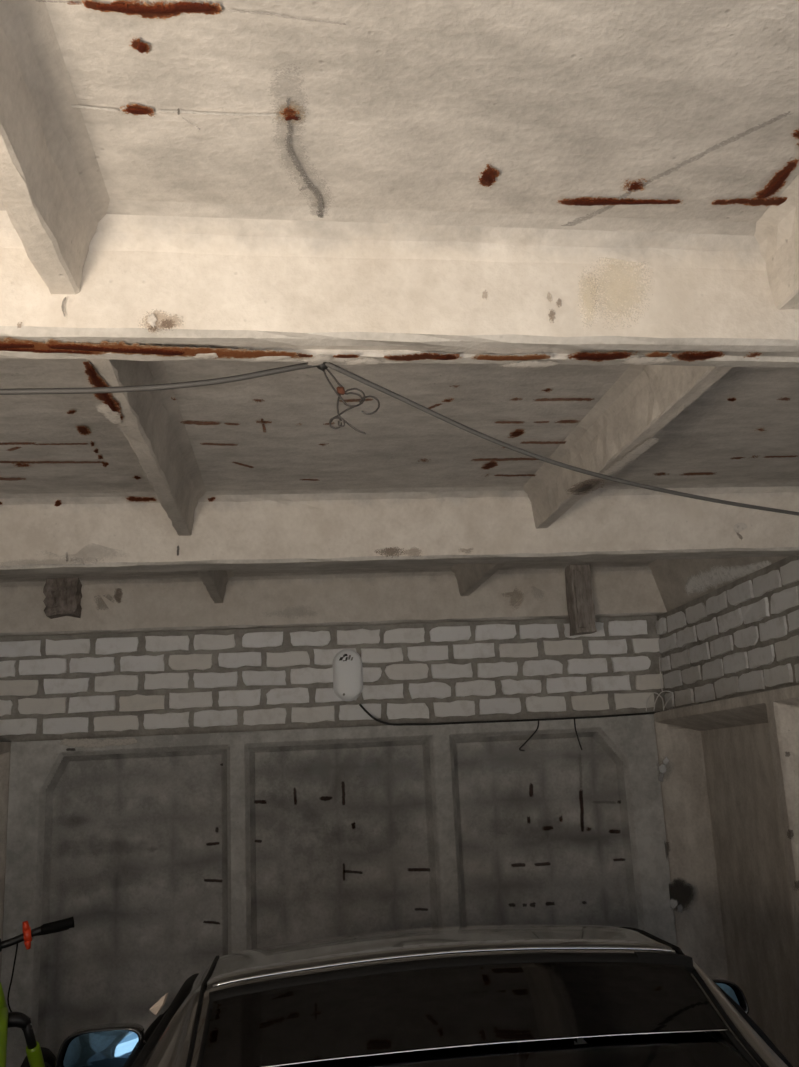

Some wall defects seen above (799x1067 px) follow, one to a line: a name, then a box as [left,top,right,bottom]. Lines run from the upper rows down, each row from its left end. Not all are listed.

rust [67,0,222,20]
rust [129,38,151,54]
rust [120,104,155,117]
rust [274,101,306,125]
rust [478,164,500,187]
rust [711,129,799,207]
rust [557,178,684,206]
rust [0,337,725,368]
rust [535,388,595,402]
rust [0,409,109,481]
rust [471,420,580,477]